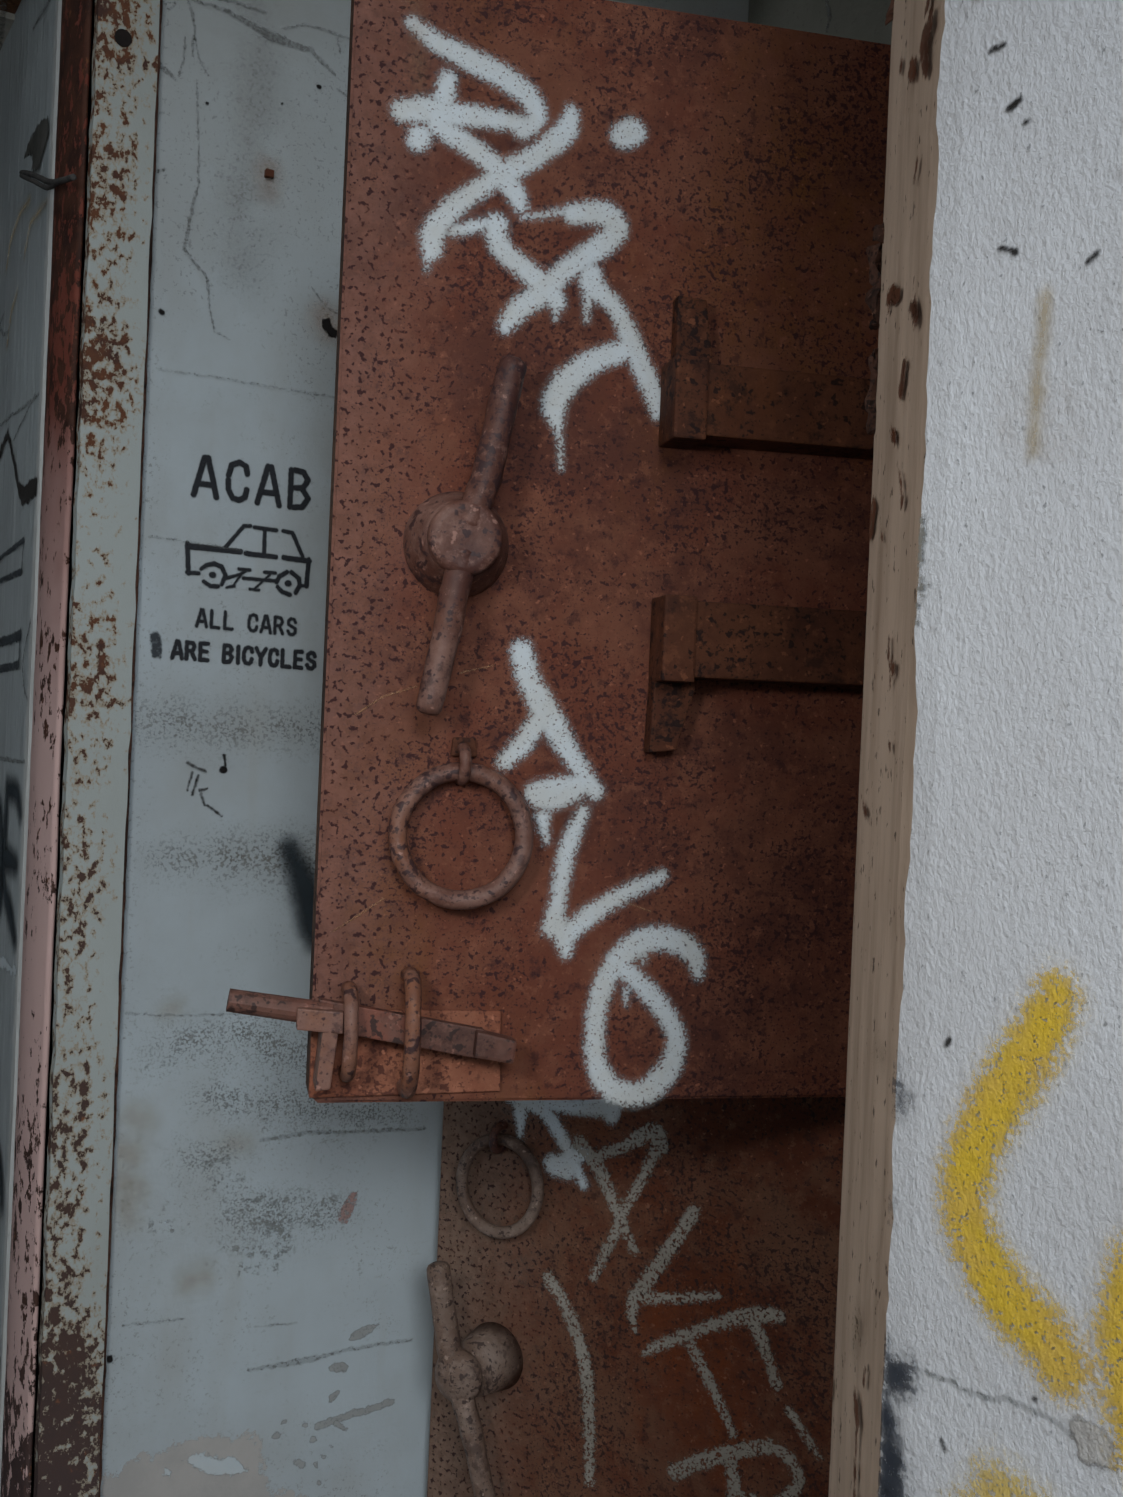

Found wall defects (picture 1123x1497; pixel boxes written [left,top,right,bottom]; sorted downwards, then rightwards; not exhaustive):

crack [178,0,347,337]
corrosion [886,284,918,328]
corrosion [898,359,906,399]
peeling [101,1362,394,1497]
corrosion [853,1368,866,1497]